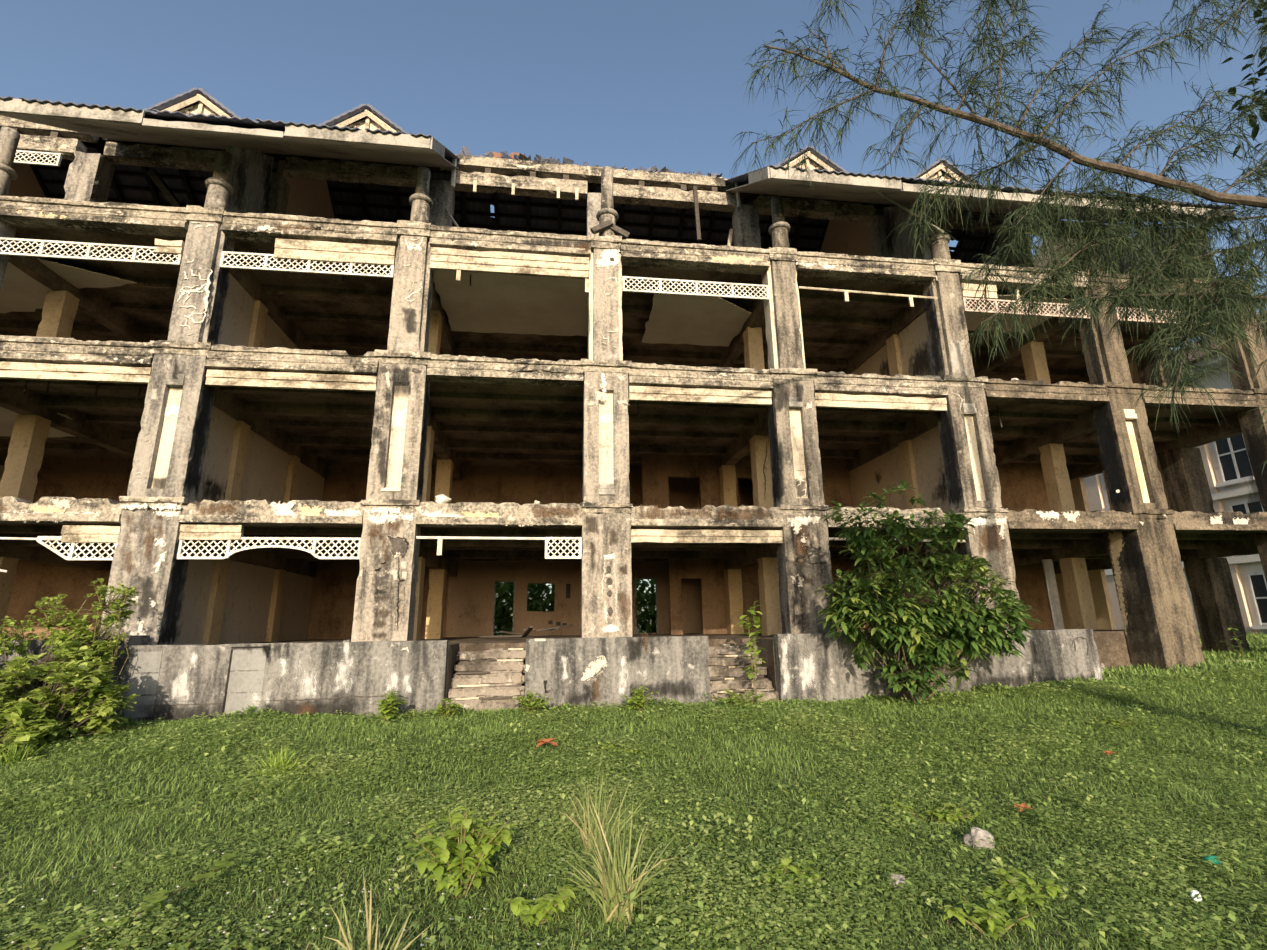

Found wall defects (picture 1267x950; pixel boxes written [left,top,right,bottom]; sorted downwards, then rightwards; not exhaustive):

peeling [177,259,213,336]
peeling [595,249,621,303]
damp [1210,435,1267,524]
damp [1124,535,1143,568]
damp [372,596,390,638]
damp [144,652,223,722]
damp [248,642,359,719]
damp [387,672,411,692]
peeling [581,656,607,682]